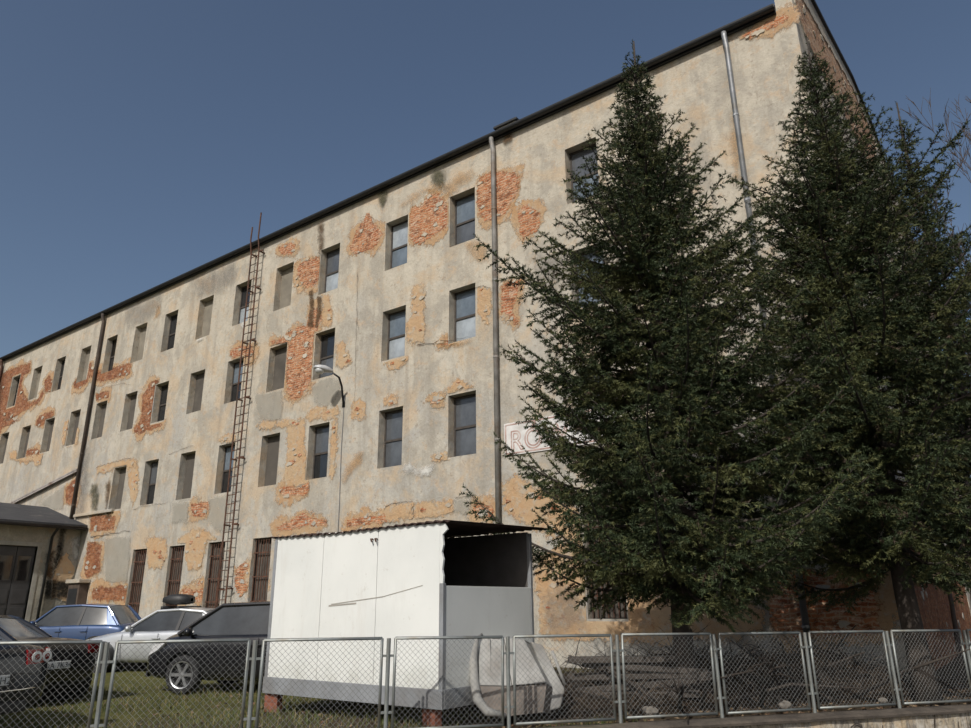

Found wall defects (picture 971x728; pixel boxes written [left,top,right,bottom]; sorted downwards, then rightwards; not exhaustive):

flaking render [738,0,876,159]
flaking render [346,213,386,259]
flaking render [408,189,453,247]
flaking render [476,164,547,244]
flaking render [230,238,333,404]
leakage [308,291,321,326]
flaking render [477,274,527,331]
flaking render [0,359,79,448]
flaking render [132,375,166,442]
flaking render [256,399,366,537]
flaking render [50,510,128,605]
flaking render [467,473,673,648]